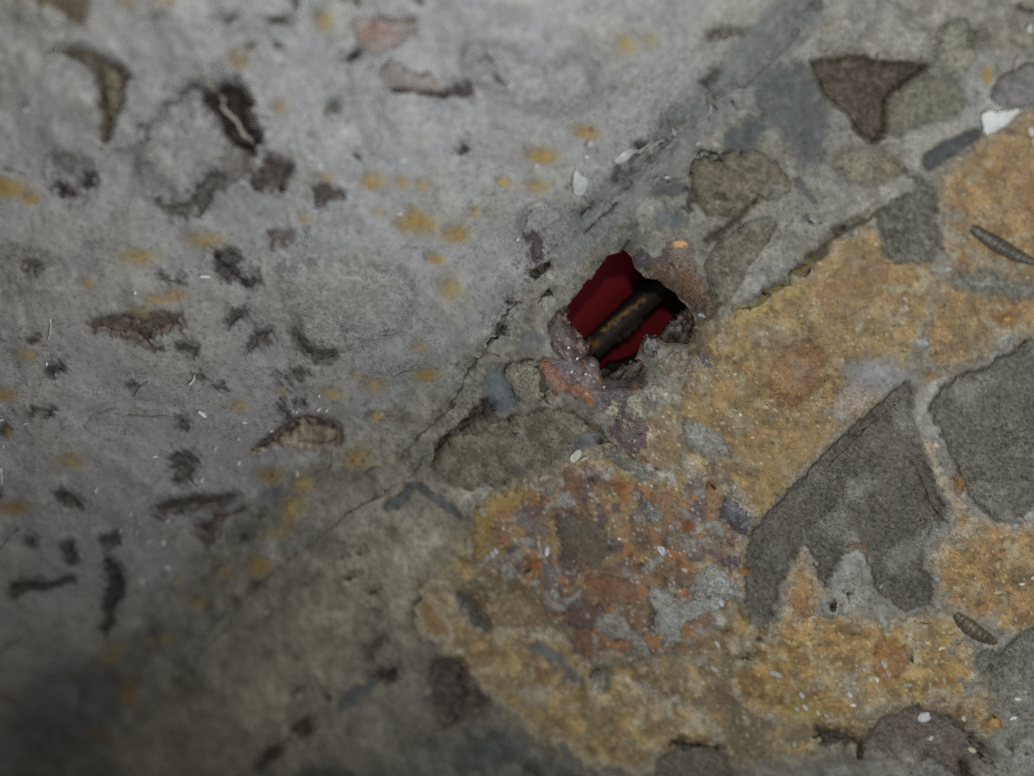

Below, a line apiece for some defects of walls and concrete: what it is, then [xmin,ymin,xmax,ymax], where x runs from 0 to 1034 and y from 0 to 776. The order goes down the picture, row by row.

corrosion [0,177,38,206]
corrosion [398,209,468,242]
spalling [524,230,552,278]
spalling [548,306,589,361]
corrosion [575,295,646,348]
crack [510,365,635,460]
crack [181,301,523,659]
corrosion [720,556,741,571]
corrosion [818,704,903,746]
corrosion [921,703,973,733]
corrosion [959,660,1034,776]
corrosion [728,745,954,776]